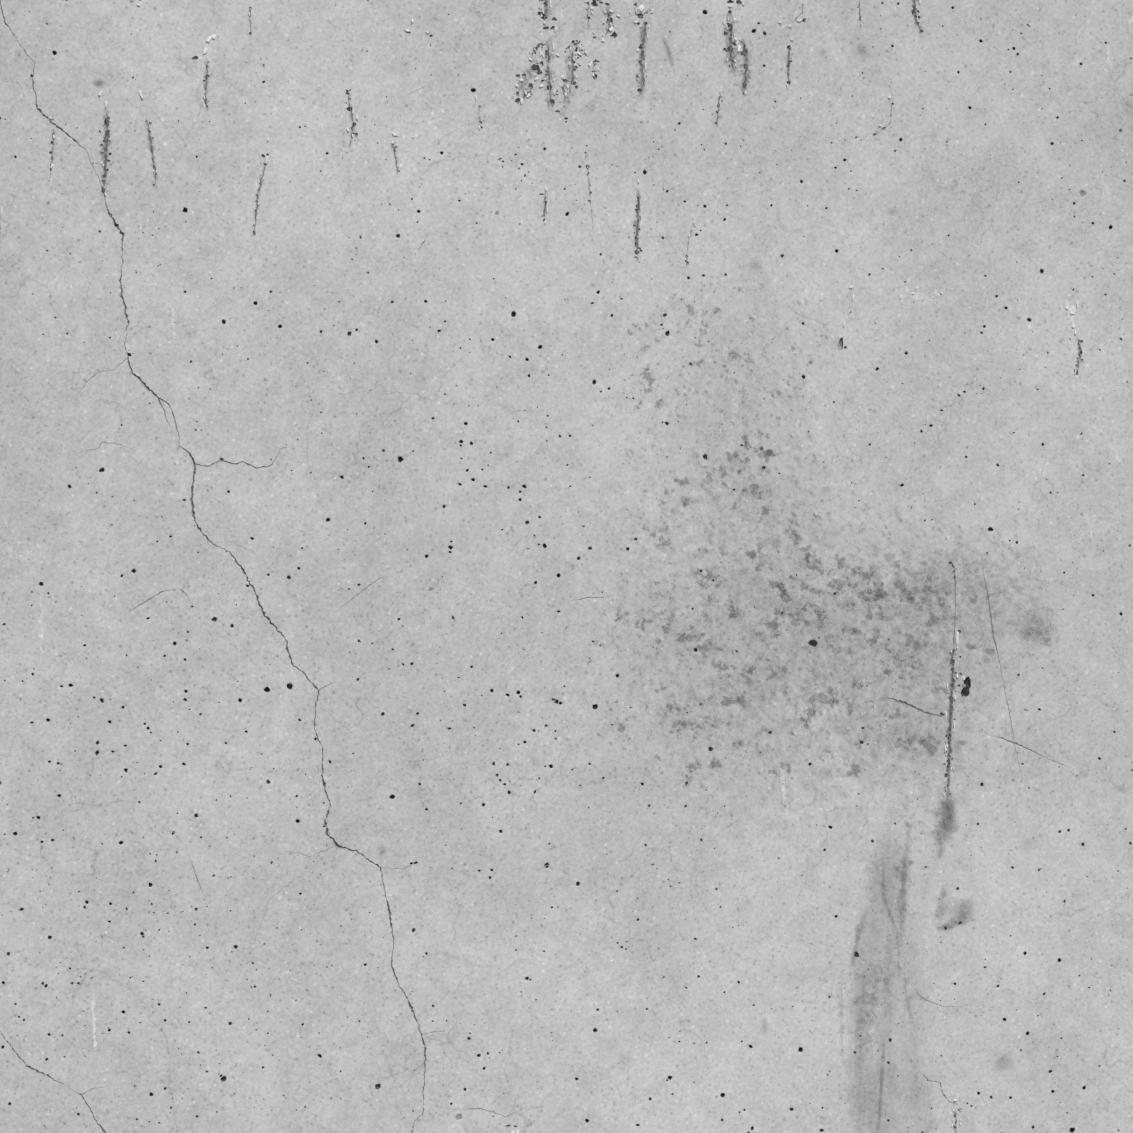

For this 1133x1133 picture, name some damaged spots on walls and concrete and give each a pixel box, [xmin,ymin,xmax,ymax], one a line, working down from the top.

spalling [515,0,654,120]
spalling [722,0,751,95]
crack [0,0,441,1133]
crack [455,1108,516,1117]